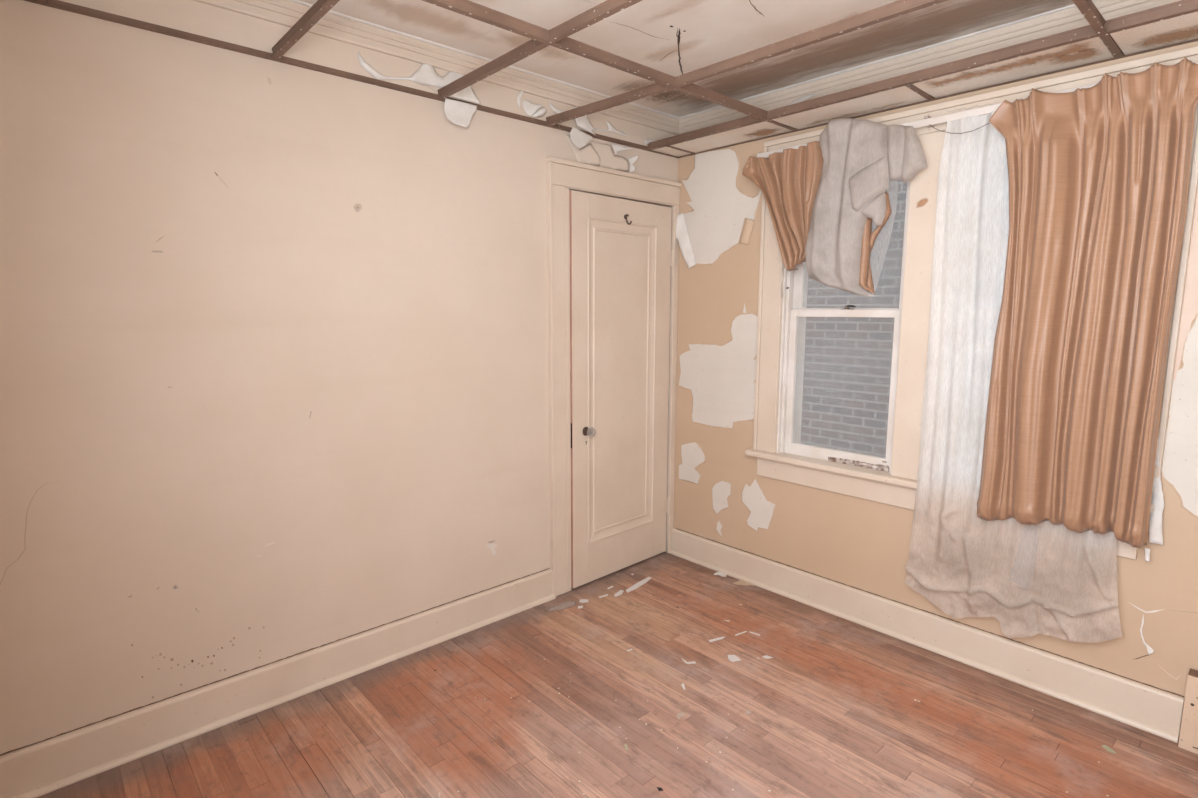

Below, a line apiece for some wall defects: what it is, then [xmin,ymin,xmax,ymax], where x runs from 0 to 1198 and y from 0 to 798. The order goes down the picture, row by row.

flaking render [676,147,762,268]
flaking render [678,302,758,429]
flaking render [1161,313,1198,518]
flaking render [678,441,777,538]